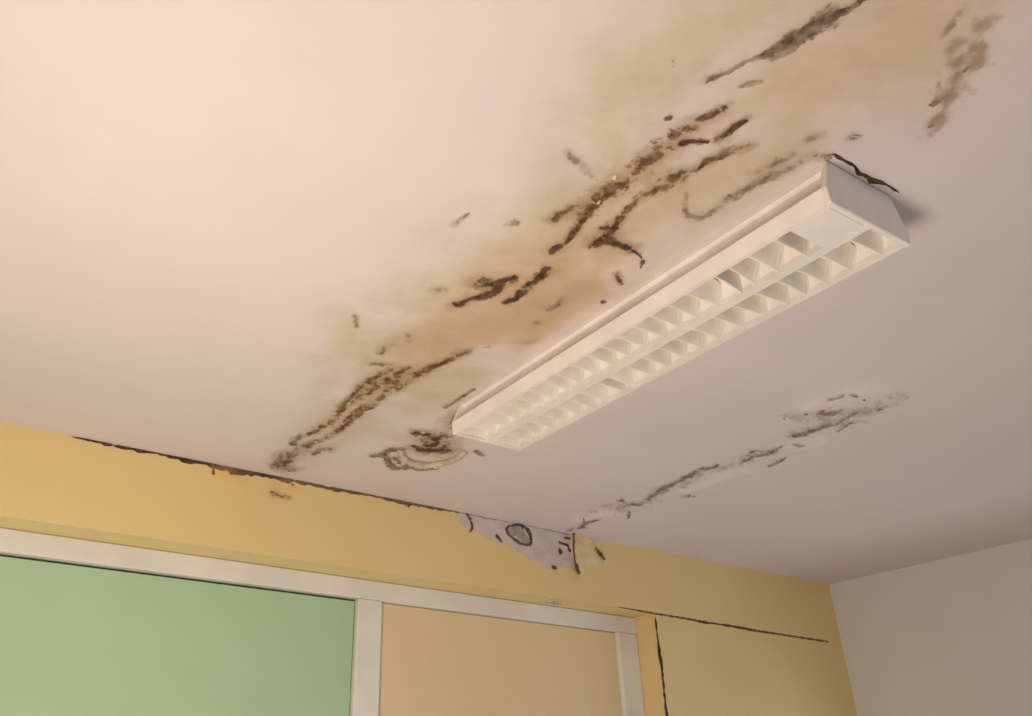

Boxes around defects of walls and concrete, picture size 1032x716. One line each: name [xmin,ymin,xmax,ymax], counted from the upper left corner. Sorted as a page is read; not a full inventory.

crack [706,0,865,88]
damp [215,0,1032,480]
crack [73,437,600,535]
peeling [270,348,484,498]
crack [619,395,859,519]
spalling [456,512,605,575]
crack [620,607,829,716]